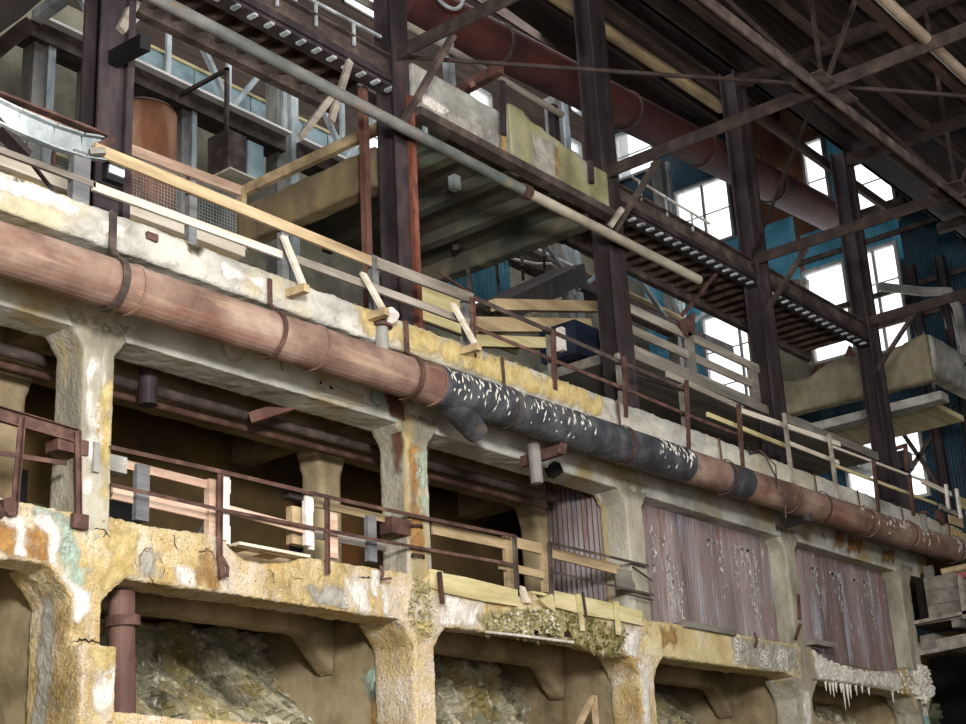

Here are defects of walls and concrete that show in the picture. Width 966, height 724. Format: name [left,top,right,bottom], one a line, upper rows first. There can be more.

rust [384,393,428,553]
rust [0,521,50,560]
damp [731,636,798,671]
damp [812,650,916,694]